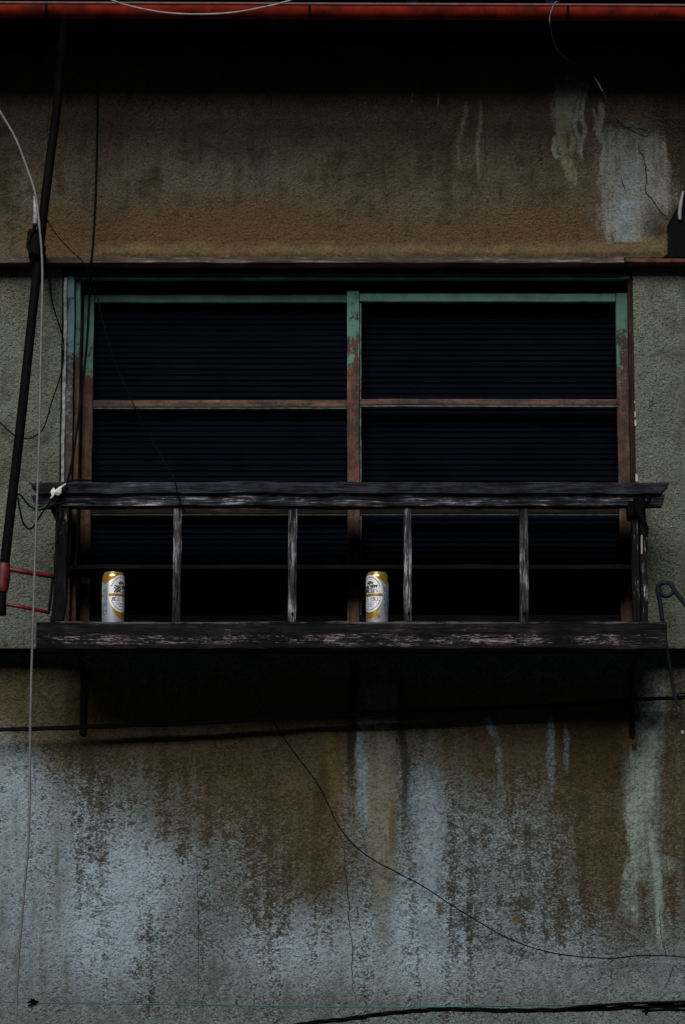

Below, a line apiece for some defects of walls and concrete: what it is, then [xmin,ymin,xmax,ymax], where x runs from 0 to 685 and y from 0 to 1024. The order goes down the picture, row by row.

leakage [551,78,677,244]
crack [621,141,667,217]
leakage [348,661,448,939]
leakage [620,684,674,982]